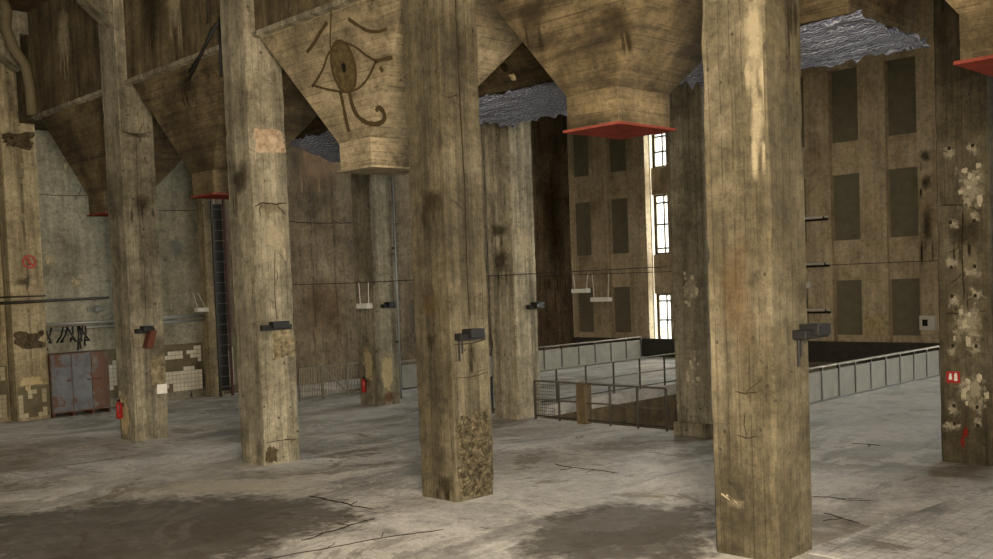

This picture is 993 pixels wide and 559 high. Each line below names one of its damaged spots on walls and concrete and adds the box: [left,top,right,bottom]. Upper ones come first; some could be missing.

spalling [2,132,35,150]
peeling [958,143,982,223]
peeling [947,258,976,275]
spalling [0,366,50,419]
spalling [104,349,129,433]
spalling [151,342,205,392]
spalling [272,329,295,360]
peeling [363,349,393,391]
peeling [949,288,981,355]
peeling [944,374,989,429]
spalling [456,409,494,498]
crack [266,496,443,559]